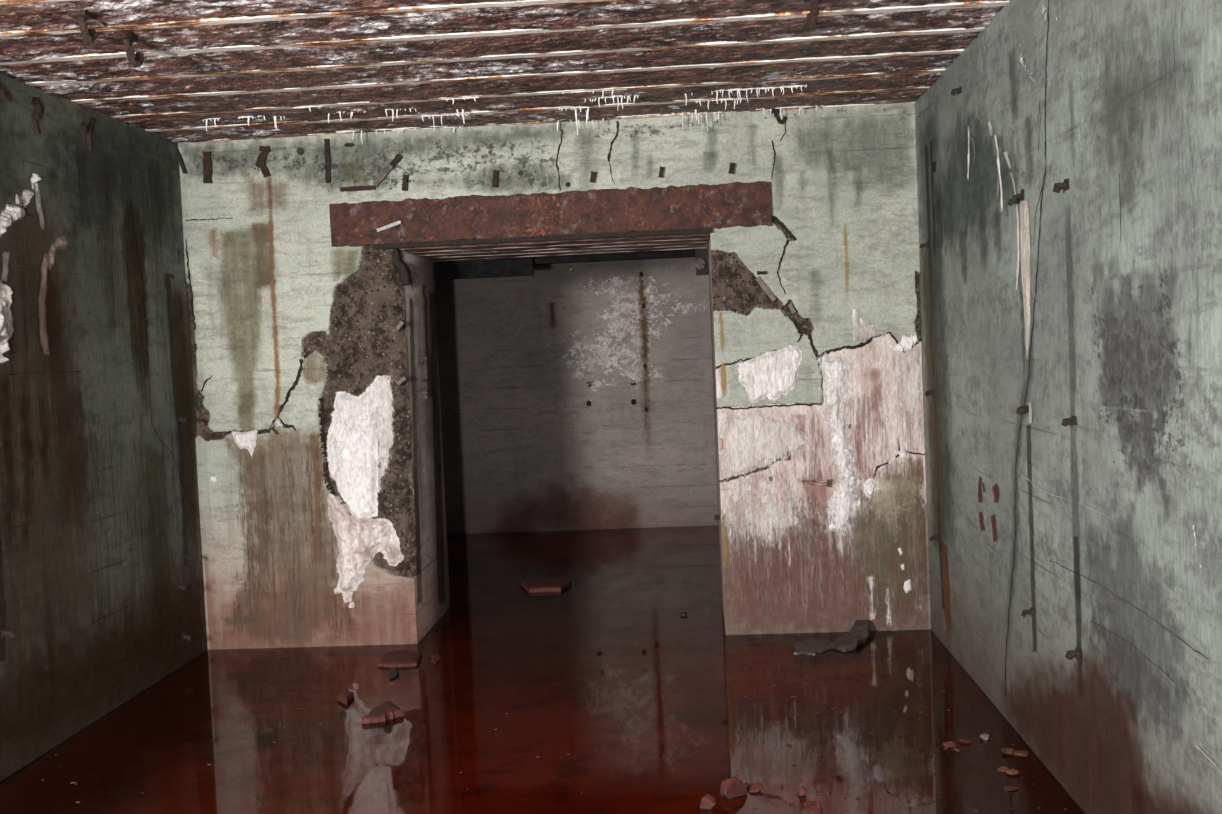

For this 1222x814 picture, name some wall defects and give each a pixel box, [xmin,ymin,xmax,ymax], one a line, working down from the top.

water stain [0,173,68,364]
crack [227,359,351,516]
spalling [303,245,417,577]
water stain [557,265,709,393]
crack [719,448,788,482]
spalling [711,250,814,336]
crack [772,216,797,295]
crack [714,332,922,369]
peeling [716,271,927,534]
water stain [718,345,926,626]
water stain [852,309,922,437]
crack [873,438,925,477]